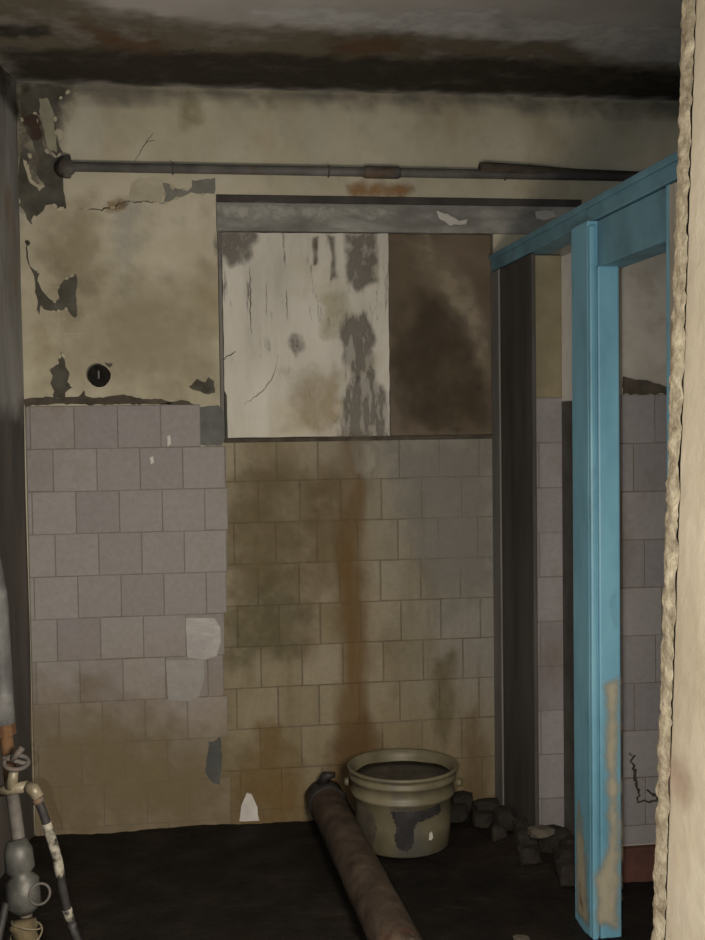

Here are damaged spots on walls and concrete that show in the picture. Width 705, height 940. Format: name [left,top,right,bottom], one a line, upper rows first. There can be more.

peeling [18,85,70,225]
water stain [0,0,682,184]
peeling [30,267,77,318]
water stain [393,236,488,420]
crack [629,753,658,803]